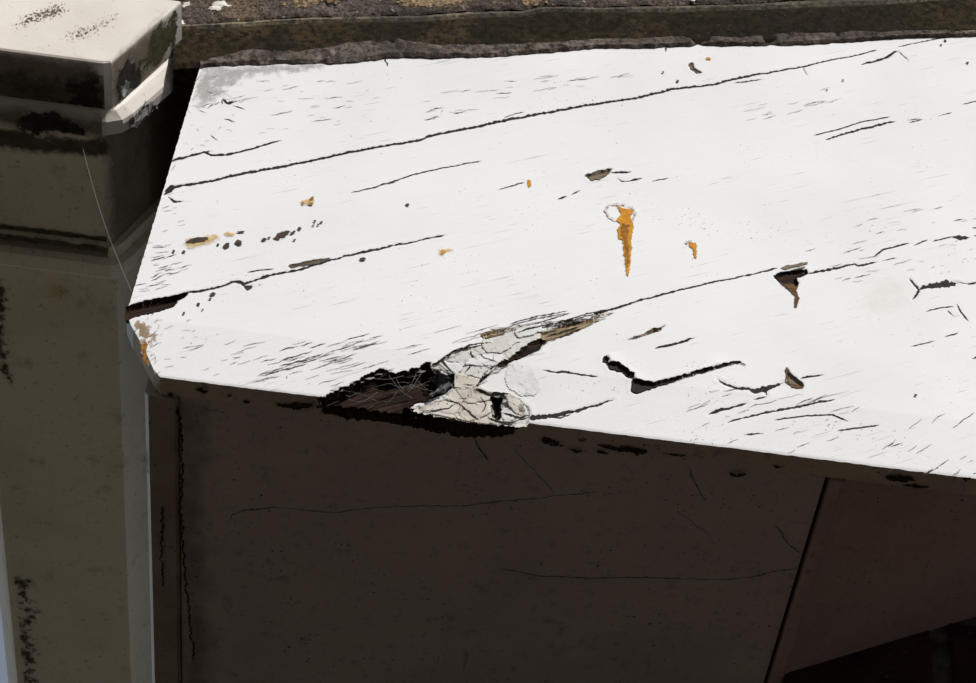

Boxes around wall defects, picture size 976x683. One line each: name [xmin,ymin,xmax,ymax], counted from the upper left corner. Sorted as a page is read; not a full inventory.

mould [0,71,109,156]
mould [116,57,142,103]
mould [129,101,159,128]
peeling [125,292,188,323]
crack [138,38,939,460]
corrosion [604,203,637,276]
peeling [773,262,808,307]
crack [807,206,976,346]
peeling [430,324,544,425]
peeling [603,325,745,393]
crack [688,375,974,475]
mould [14,576,40,683]